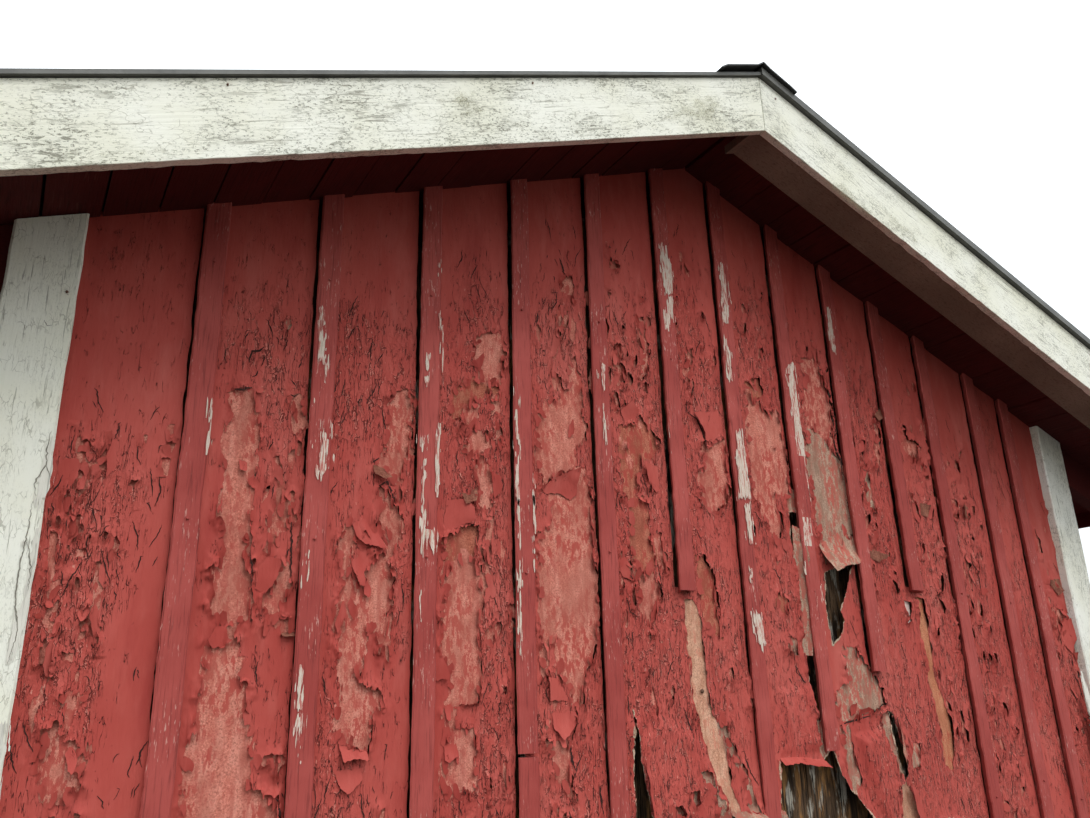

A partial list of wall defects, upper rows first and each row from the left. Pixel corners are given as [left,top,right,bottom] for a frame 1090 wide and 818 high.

peeling [318,306,329,376]
peeling [658,243,691,331]
peeling [0,720,11,795]
crack [6,723,33,774]
peeling [6,430,120,818]
peeling [178,381,335,818]
crack [480,684,510,748]
peeling [329,276,672,818]
crack [545,661,674,817]
peeling [673,555,788,818]
peeling [682,307,853,656]
peeling [835,642,927,818]